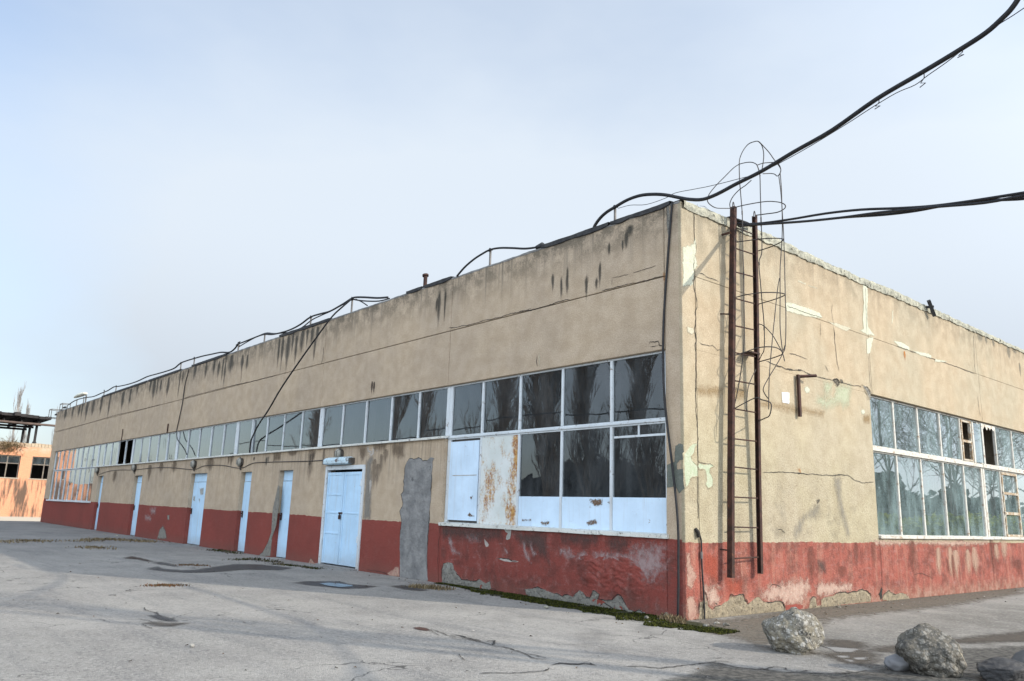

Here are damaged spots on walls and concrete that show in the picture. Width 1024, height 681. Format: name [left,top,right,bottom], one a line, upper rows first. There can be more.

peeling [682,240,698,286]
damp [277,327,319,364]
damp [64,355,248,418]
peeling [682,442,715,490]
crack [764,472,868,483]
spalling [441,561,493,590]
spalling [524,586,645,614]
spalling [686,553,910,620]